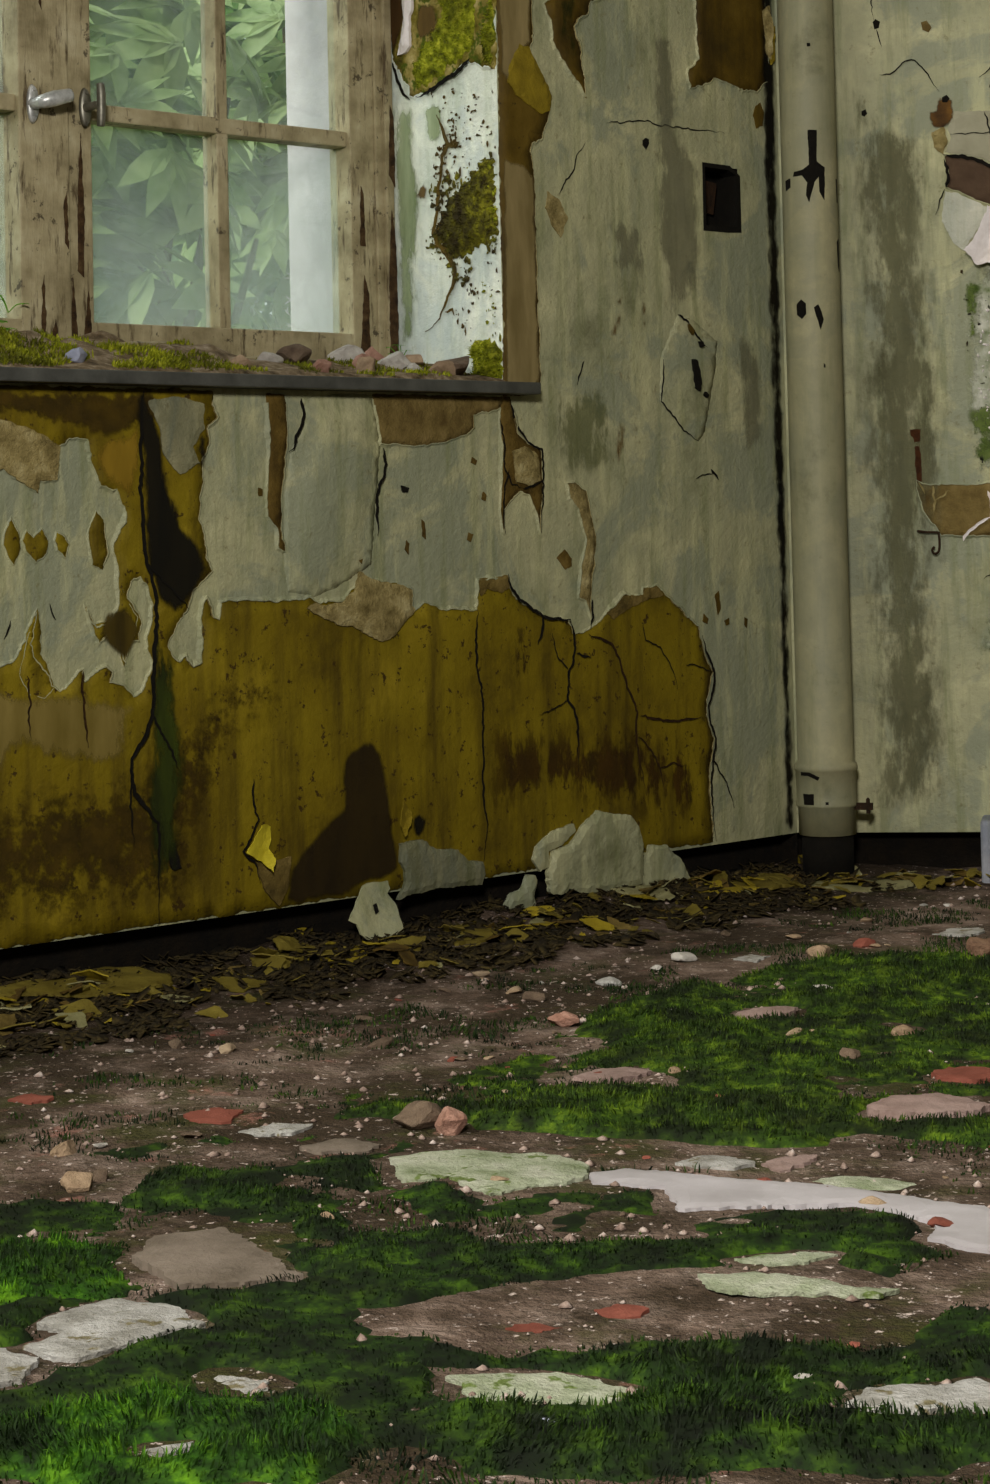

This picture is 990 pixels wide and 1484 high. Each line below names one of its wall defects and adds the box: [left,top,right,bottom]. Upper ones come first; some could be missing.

peeling [685,0,769,128]
peeling [41,133,92,337]
water stain [396,88,496,337]
water stain [456,253,500,344]
peeling [372,0,606,536]
flaking render [941,152,990,251]
crack [500,397,545,534]
crack [25,676,33,737]
crack [80,672,88,742]
flaking render [0,384,748,949]
crack [475,612,488,859]
crack [508,574,734,836]